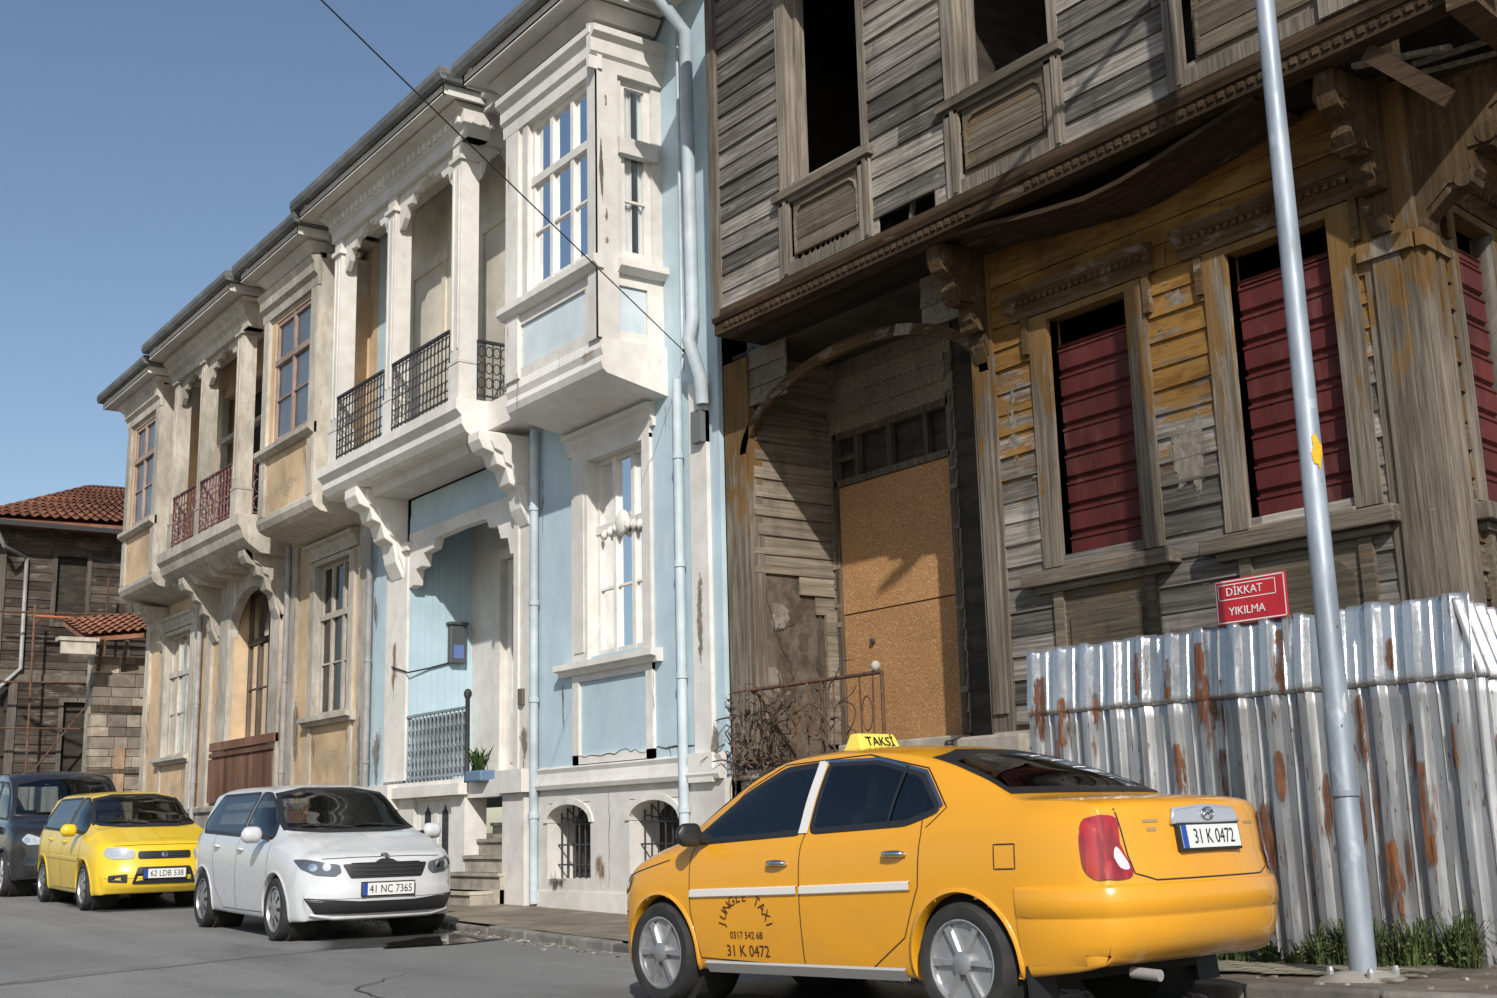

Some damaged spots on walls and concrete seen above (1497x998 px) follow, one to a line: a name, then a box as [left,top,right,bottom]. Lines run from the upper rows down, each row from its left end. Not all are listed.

peeling [1163,282,1191,311]
peeling [1168,406,1209,498]
rust [1031,676,1071,758]
rust [1173,744,1187,792]
rust [1194,642,1228,796]
rust [1260,750,1286,877]
rust [1273,629,1302,750]
rust [1312,773,1337,862]
rust [1385,638,1394,673]
rust [1355,694,1438,921]
rust [1451,723,1459,781]